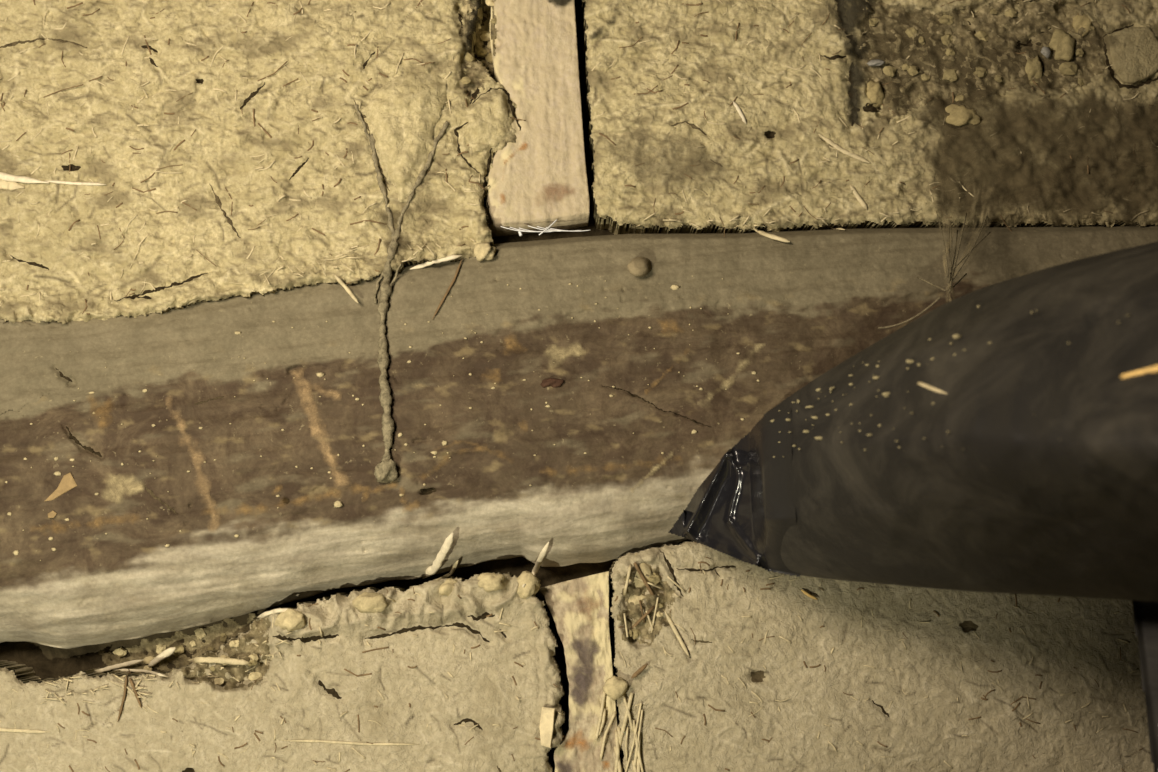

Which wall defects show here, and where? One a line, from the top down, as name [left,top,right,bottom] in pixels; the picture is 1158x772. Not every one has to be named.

spalling [859,0,1105,124]
crack [273,612,506,643]
crack [318,680,342,699]